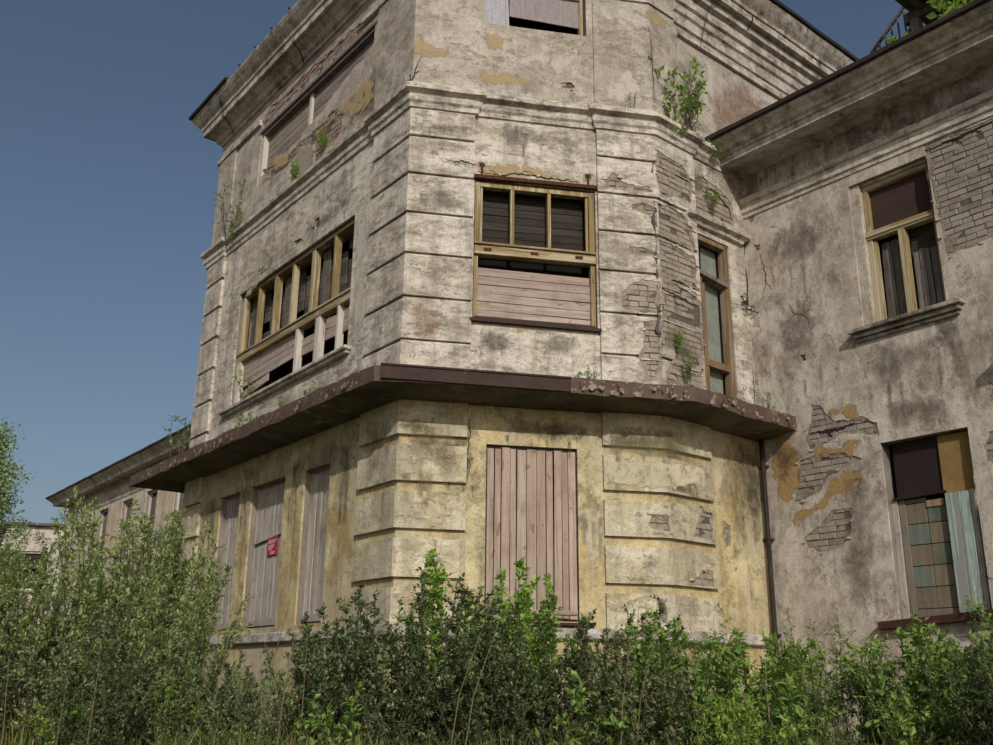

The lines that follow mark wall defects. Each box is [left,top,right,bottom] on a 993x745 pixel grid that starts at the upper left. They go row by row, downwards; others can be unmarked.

flaking render [262,18,374,127]
peeling [474,32,542,85]
peeling [519,49,583,95]
flaking render [262,78,374,179]
peeling [480,162,581,181]
flaking render [924,118,993,258]
flaking render [580,151,734,398]
damp [513,424,584,438]
flaking render [710,349,879,555]
flaking render [647,511,673,534]
flaking render [694,505,731,547]
peeling [973,431,993,594]